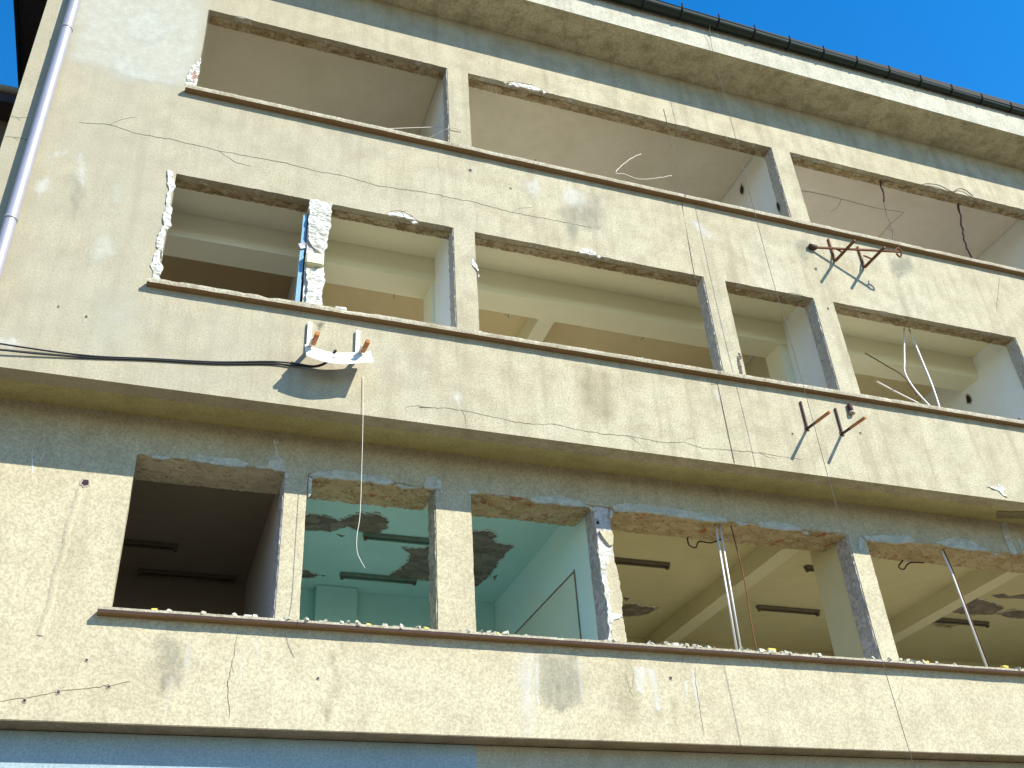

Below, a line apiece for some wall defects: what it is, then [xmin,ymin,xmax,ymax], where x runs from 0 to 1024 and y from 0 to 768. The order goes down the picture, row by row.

spalling [151,169,176,279]
crack [804,191,904,237]
peeling [305,266,325,305]
peeling [305,511,390,537]
peeling [302,568,326,578]
peeling [388,545,430,582]
peeling [472,529,516,587]
peeling [953,593,1024,619]